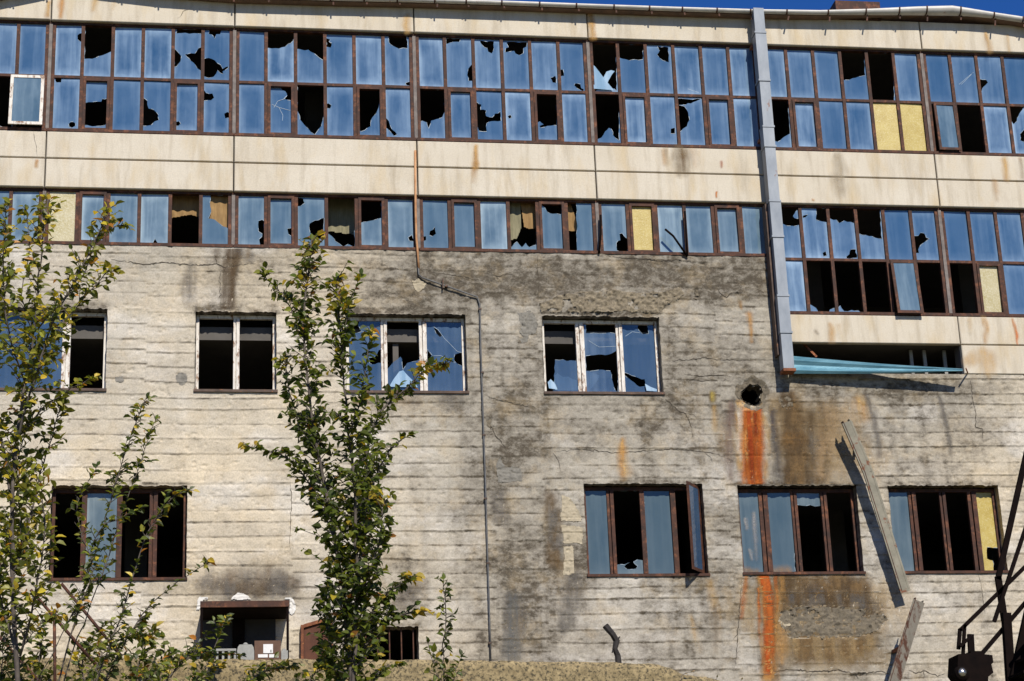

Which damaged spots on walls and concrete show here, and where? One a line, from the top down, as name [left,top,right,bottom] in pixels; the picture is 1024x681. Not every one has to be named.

damp [222,249,250,307]
spalling [735,375,770,411]
crack [553,401,733,466]
corrosion [737,401,765,485]
damp [770,391,846,484]
corrosion [742,575,779,681]
spalling [778,607,887,639]